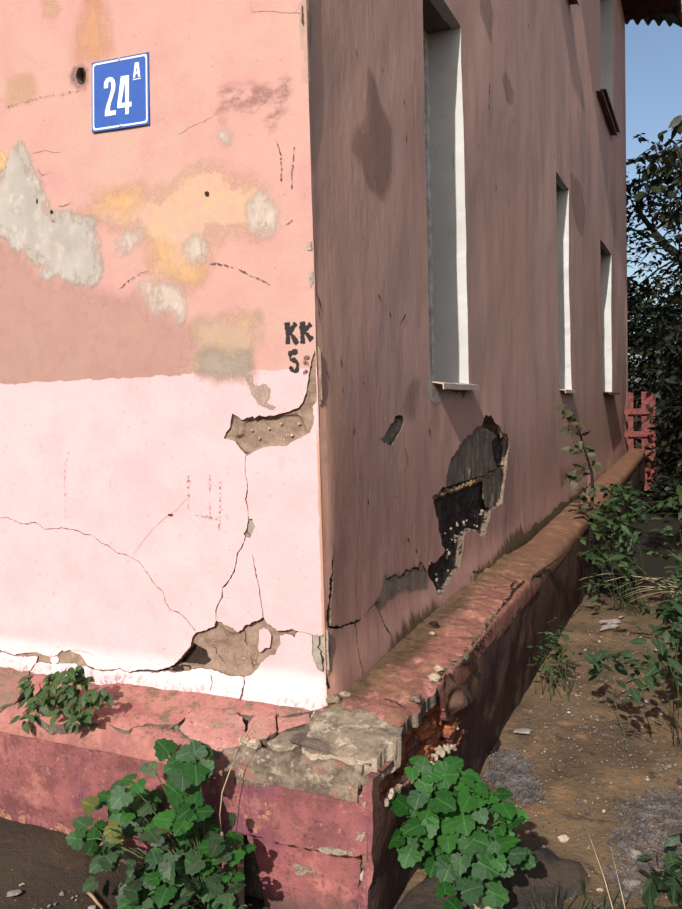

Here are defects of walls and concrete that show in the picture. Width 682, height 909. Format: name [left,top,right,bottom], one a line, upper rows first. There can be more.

damp [353,75,391,195]
peeling [0,141,277,322]
flaking render [225,345,322,455]
crack [0,503,195,630]
flaking render [378,416,509,609]
crack [109,662,212,690]
flaking render [168,617,299,676]
spalling [225,702,468,807]